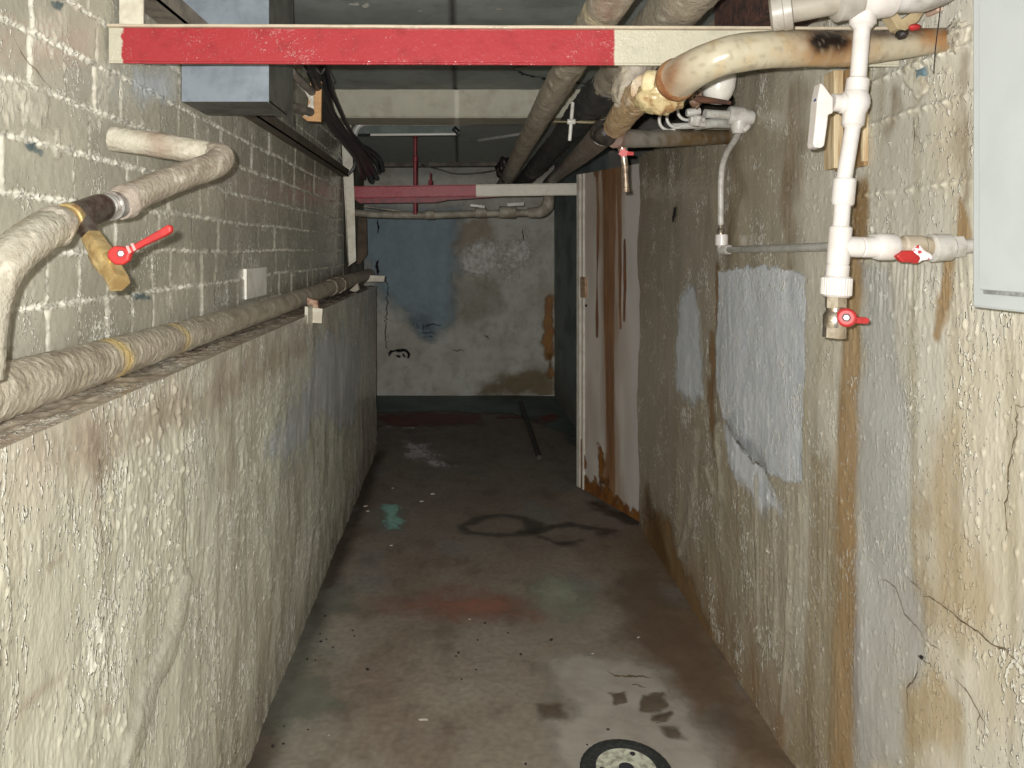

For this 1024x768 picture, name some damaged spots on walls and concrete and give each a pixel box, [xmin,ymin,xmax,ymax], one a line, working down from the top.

rust [852,181,867,237]
leakage [481,371,554,395]
rust [542,295,554,379]
rust [581,167,714,643]
rust [829,257,864,768]
crack [1004,399,1024,539]
crack [883,578,1023,729]